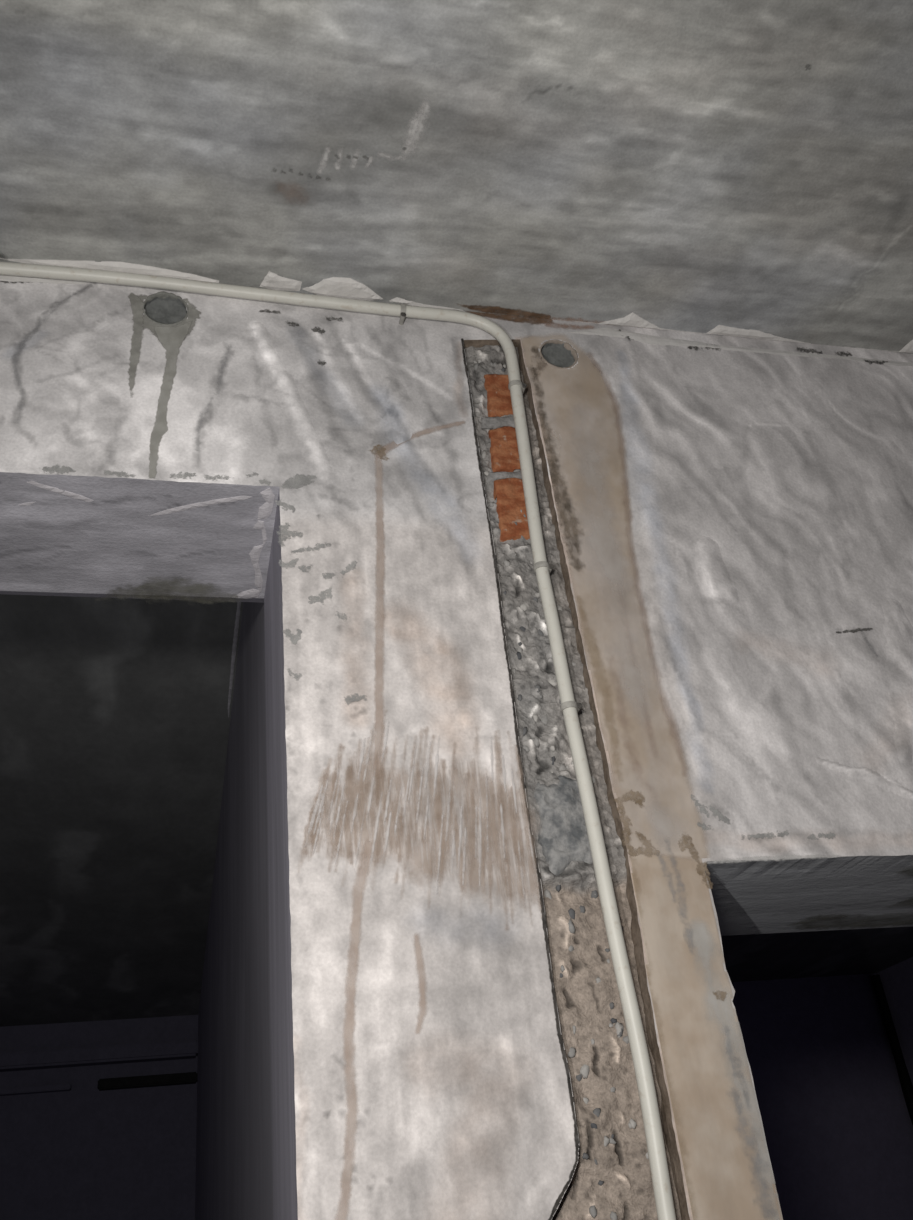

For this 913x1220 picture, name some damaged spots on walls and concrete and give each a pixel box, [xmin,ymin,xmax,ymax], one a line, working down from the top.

peeling [260,271,463,311]
water stain [128,293,201,478]
flaking render [150,472,331,717]
flaking render [309,561,357,604]
water stain [309,727,535,896]
spalling [461,338,681,1220]